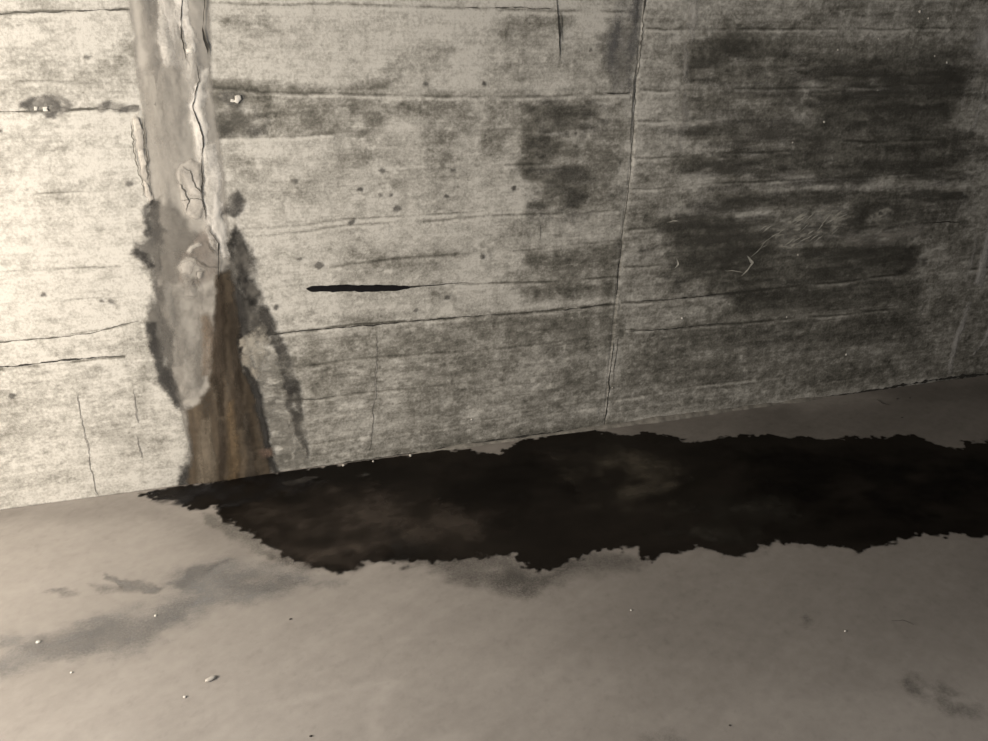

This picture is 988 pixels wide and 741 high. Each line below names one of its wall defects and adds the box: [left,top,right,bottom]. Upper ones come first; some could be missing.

peeling [177,159,216,297]
crack [180,0,219,279]
rust [187,272,278,484]
leakage [132,0,988,594]
crack [547,0,646,311]